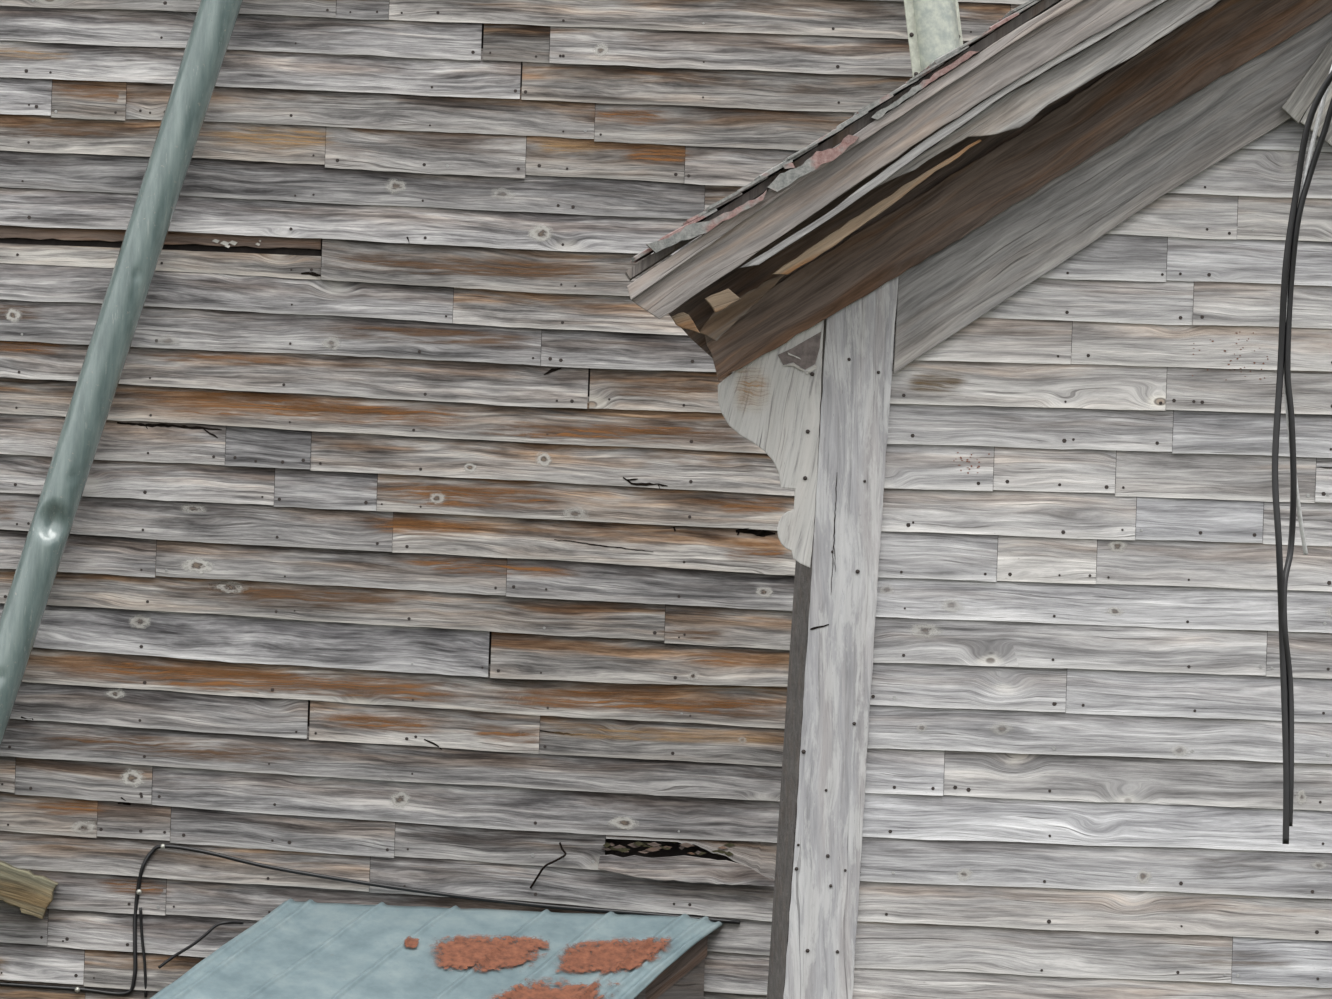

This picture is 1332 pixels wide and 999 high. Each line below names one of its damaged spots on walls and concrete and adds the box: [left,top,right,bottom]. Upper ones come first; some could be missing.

rust [404,936,419,948]
rust [435,935,670,999]